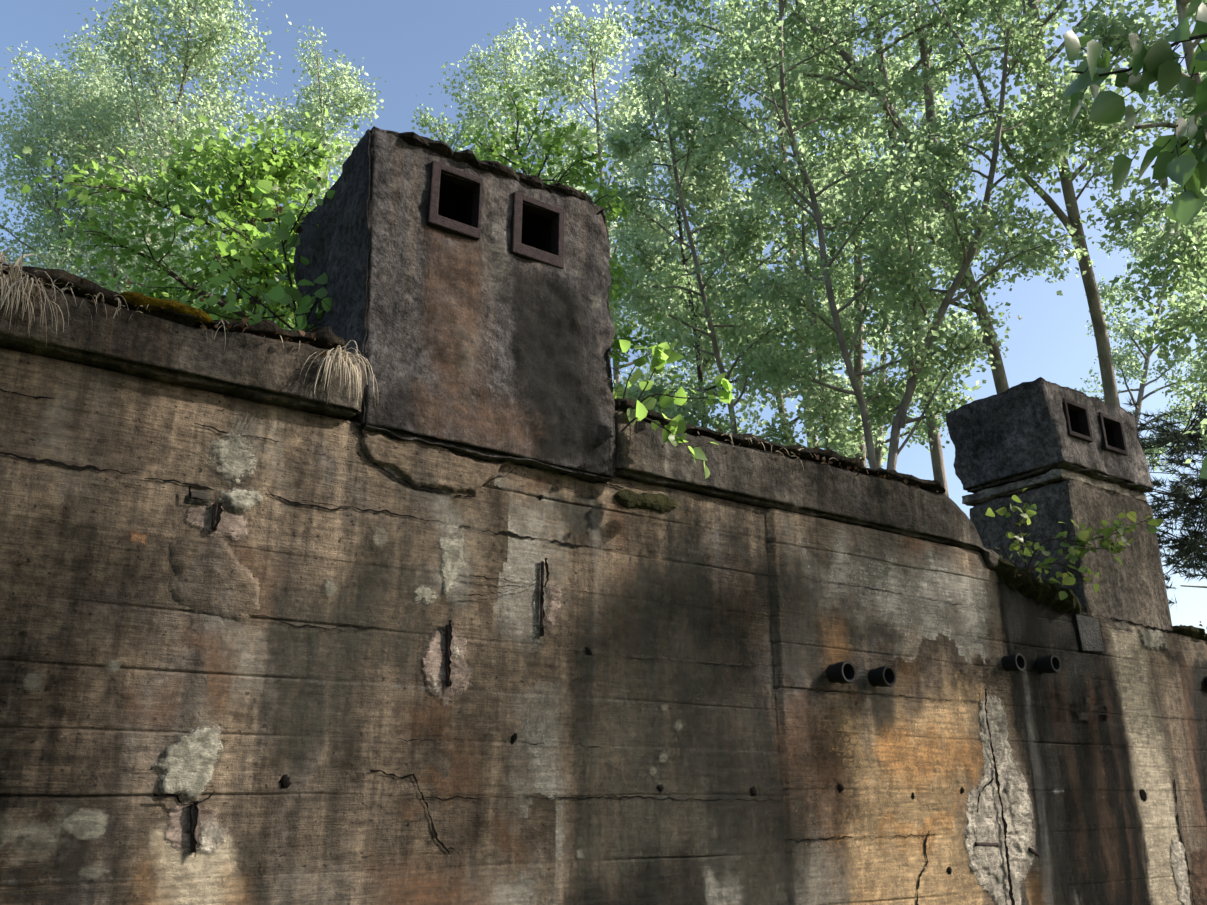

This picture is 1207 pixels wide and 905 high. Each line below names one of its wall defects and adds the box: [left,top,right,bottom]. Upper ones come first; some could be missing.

damp [498,253,606,474]
crack [0,452,214,491]
spalling [185,429,263,541]
crack [260,418,627,550]
spalling [153,726,229,857]
spalling [422,620,473,707]
crack [370,770,779,857]
damp [515,505,820,905]
crack [790,831,933,905]
spalling [964,689,1040,905]
damp [998,578,1151,905]
damp [1159,644,1207,823]